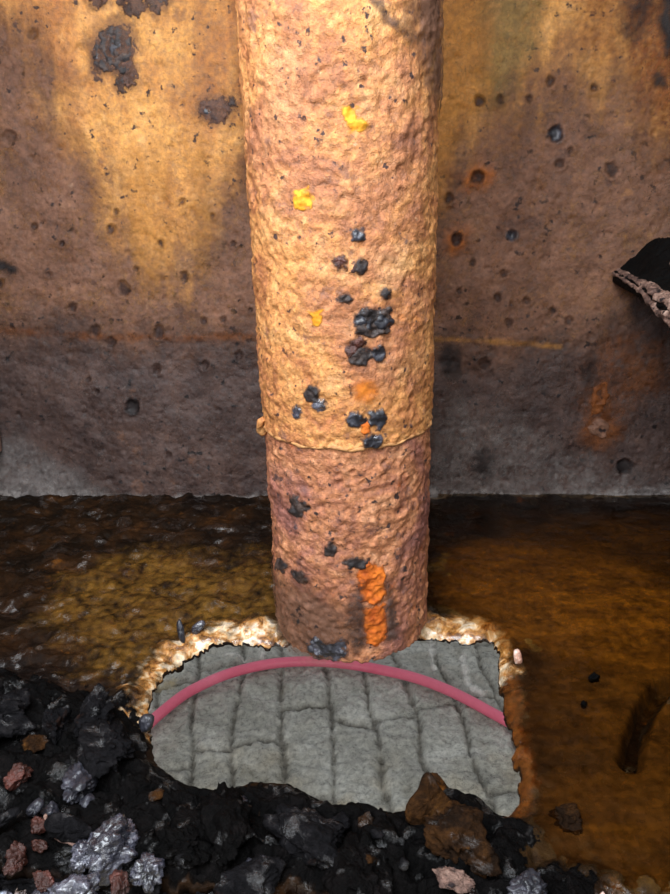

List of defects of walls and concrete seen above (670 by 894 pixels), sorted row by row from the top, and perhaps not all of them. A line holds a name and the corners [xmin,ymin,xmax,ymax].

corrosion [332,255,369,275]
corrosion [351,227,366,242]
leakage [409,0,670,499]
corrosion [345,287,395,366]
corrosion [292,385,327,419]
corrosion [345,381,388,449]
corrosion [288,495,311,518]
corrosion [275,558,307,584]
corrosion [324,542,370,570]
leakage [387,599,397,641]
corrosion [306,636,348,662]
leakage [438,513,670,894]